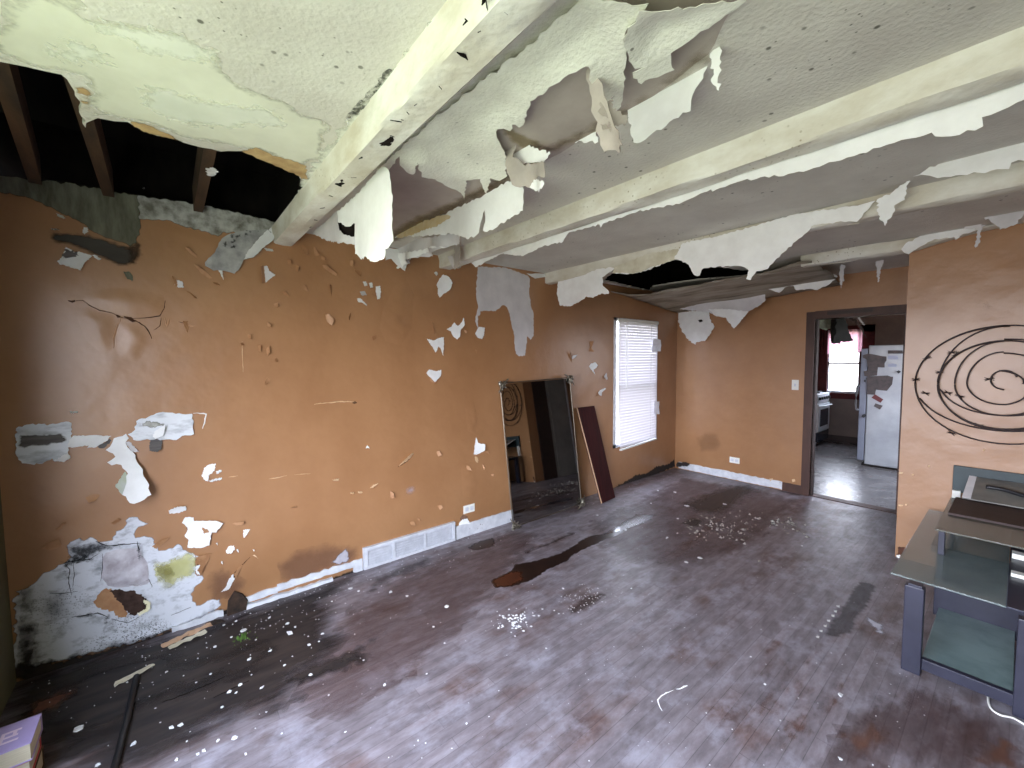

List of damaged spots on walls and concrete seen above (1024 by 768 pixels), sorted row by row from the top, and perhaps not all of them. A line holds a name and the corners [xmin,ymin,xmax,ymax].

flaking render [0,175,275,285]
peeling [0,0,329,163]
peeling [313,0,746,306]
peeling [427,82,1024,356]
crack [68,300,170,348]
peeling [15,411,207,504]
water stain [7,517,363,768]